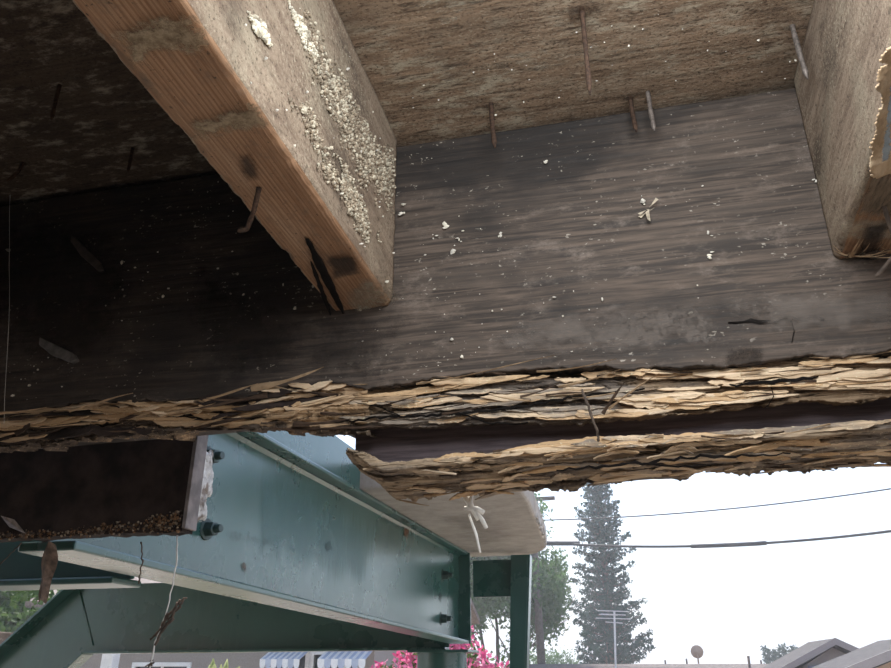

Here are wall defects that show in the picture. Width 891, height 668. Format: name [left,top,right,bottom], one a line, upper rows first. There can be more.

peeling [0,356,891,445]
flaking render [197,450,214,523]
peeling [406,419,891,501]